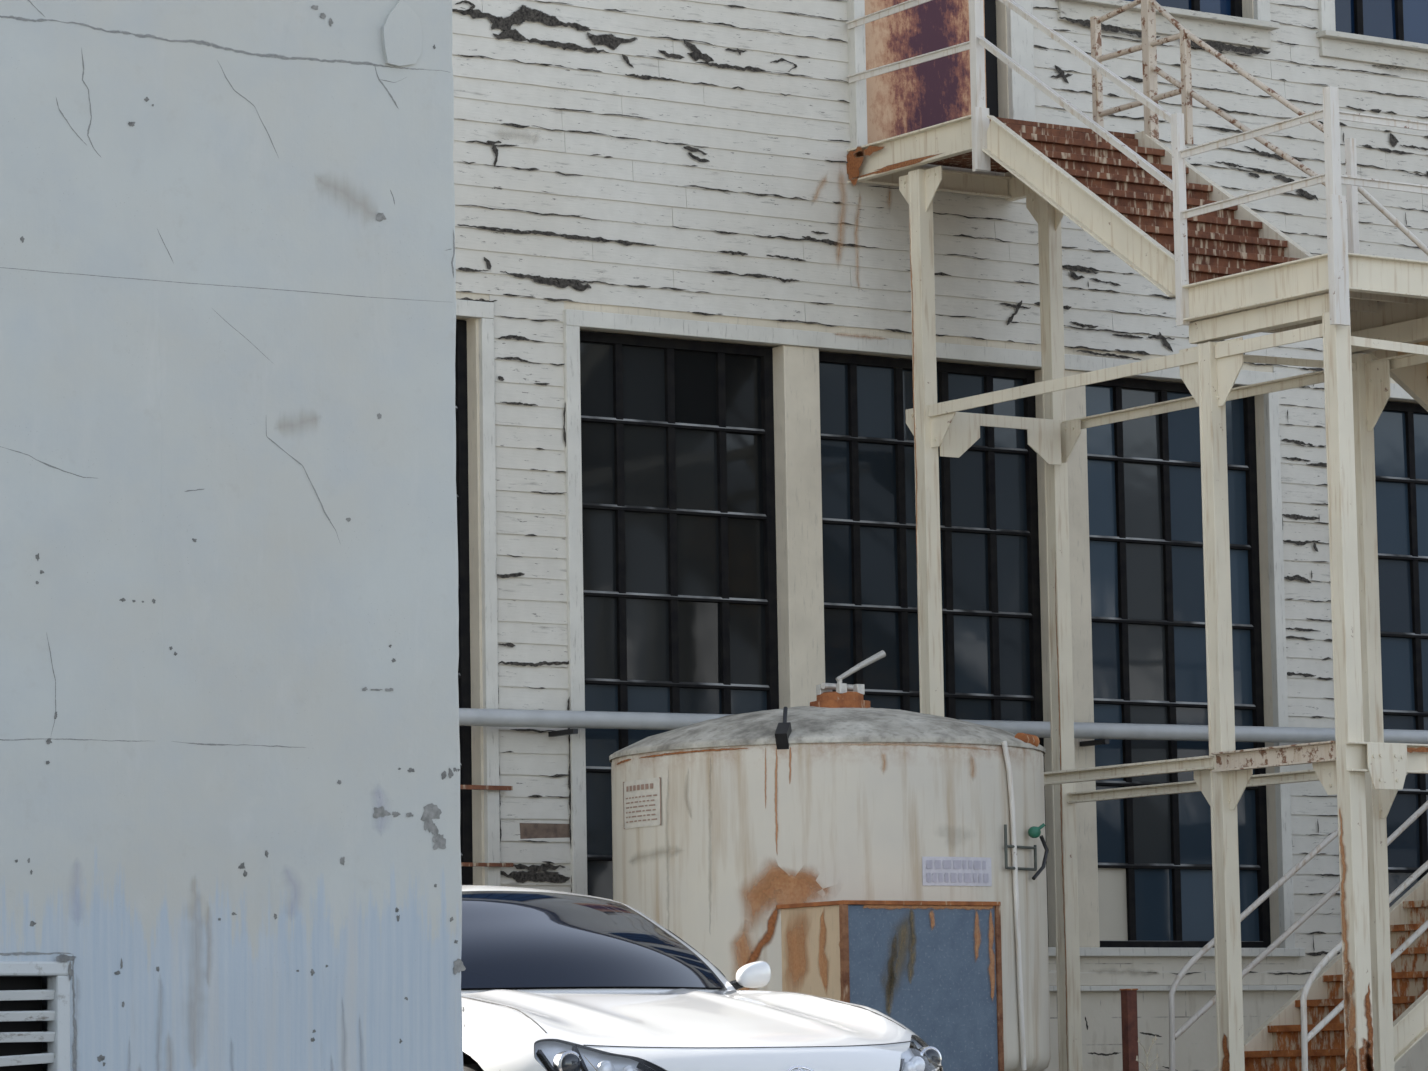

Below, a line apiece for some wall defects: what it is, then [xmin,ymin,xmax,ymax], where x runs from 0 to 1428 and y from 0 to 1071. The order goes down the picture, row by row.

crack [0,0,448,157]
peeling [463,140,583,176]
peeling [503,123,710,166]
peeling [452,0,849,89]
spalling [1033,6,1428,200]
peeling [457,205,654,246]
peeling [458,257,711,342]
spalling [1063,305,1189,360]
crack [3,447,91,478]
crack [266,430,339,539]
rust [735,747,827,968]
rust [1339,809,1374,1071]